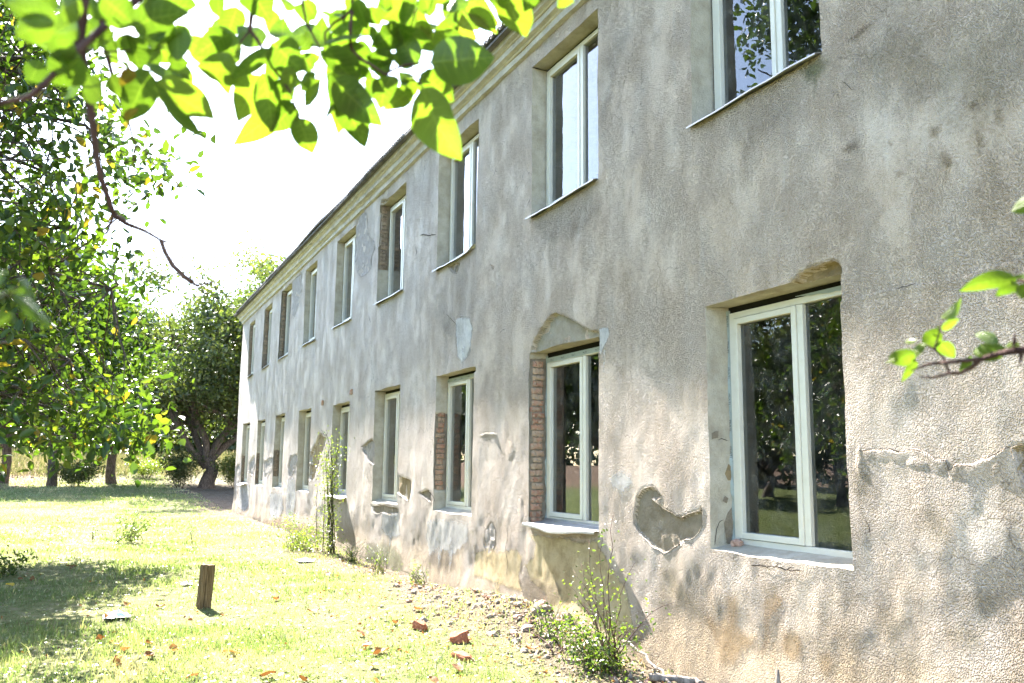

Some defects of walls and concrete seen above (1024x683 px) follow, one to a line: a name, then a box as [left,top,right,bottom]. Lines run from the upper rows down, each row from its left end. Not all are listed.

flaking render [790,259,842,284]
peeling [456,318,472,360]
flaking render [362,438,374,464]
flaking render [372,413,447,537]
flaking render [529,312,600,522]
flaking render [634,486,703,554]